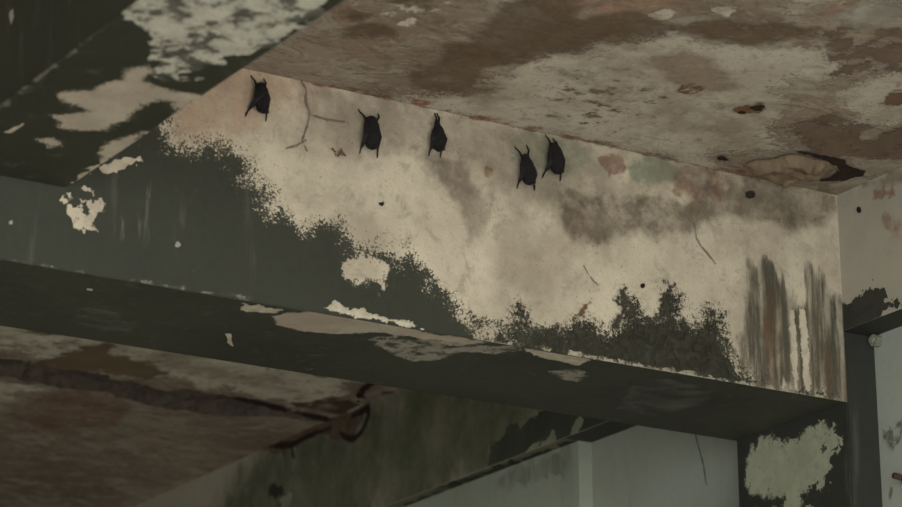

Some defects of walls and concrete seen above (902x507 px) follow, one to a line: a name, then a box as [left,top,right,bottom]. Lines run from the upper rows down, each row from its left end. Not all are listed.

leakage [345,12,395,37]
leakage [412,0,816,97]
peeling [36,0,902,402]
leakage [563,201,610,243]
leakage [679,185,816,229]
leakage [487,257,902,402]
peeling [0,326,367,422]
crack [266,383,393,459]
peeling [744,419,844,507]